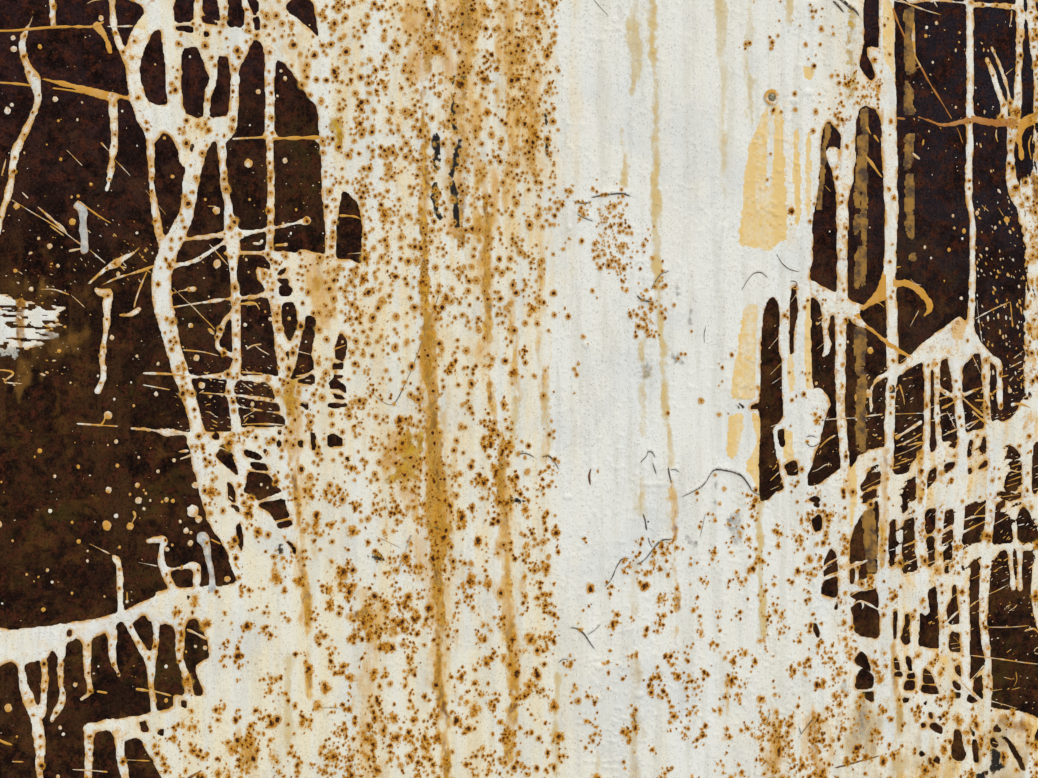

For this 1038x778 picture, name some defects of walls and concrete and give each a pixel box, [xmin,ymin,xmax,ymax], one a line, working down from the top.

peeling [139,30,167,105]
peeling [181,40,319,142]
rust [768,0,835,69]
rust [811,5,891,134]
rust [969,0,1038,360]
rust [152,0,687,778]
peeling [726,287,812,502]
rust [924,356,1003,426]
peeling [216,449,289,521]
crack [604,514,671,586]
crack [641,446,759,497]
peeling [821,327,1038,718]